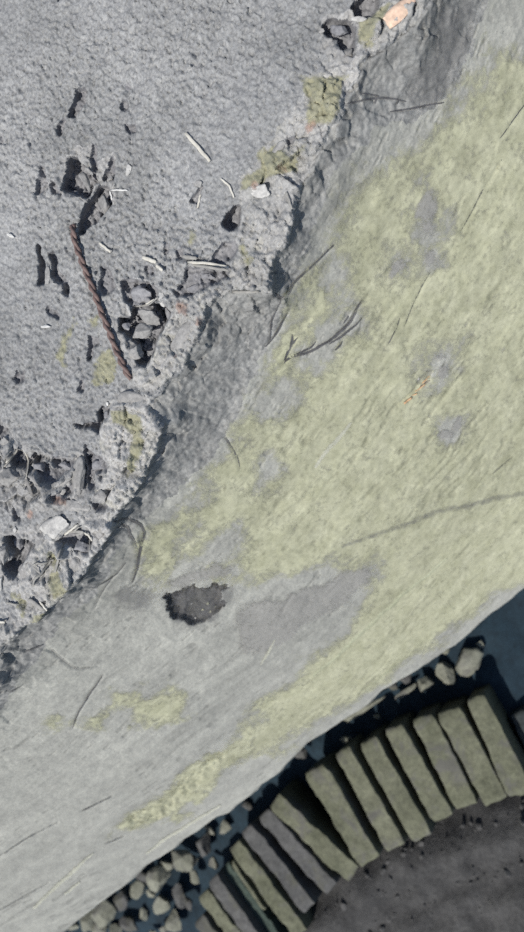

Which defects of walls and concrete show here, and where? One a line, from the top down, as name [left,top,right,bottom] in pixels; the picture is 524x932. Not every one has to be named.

spalling [0,0,489,710]
crack [265,245,362,363]
crack [93,518,146,592]